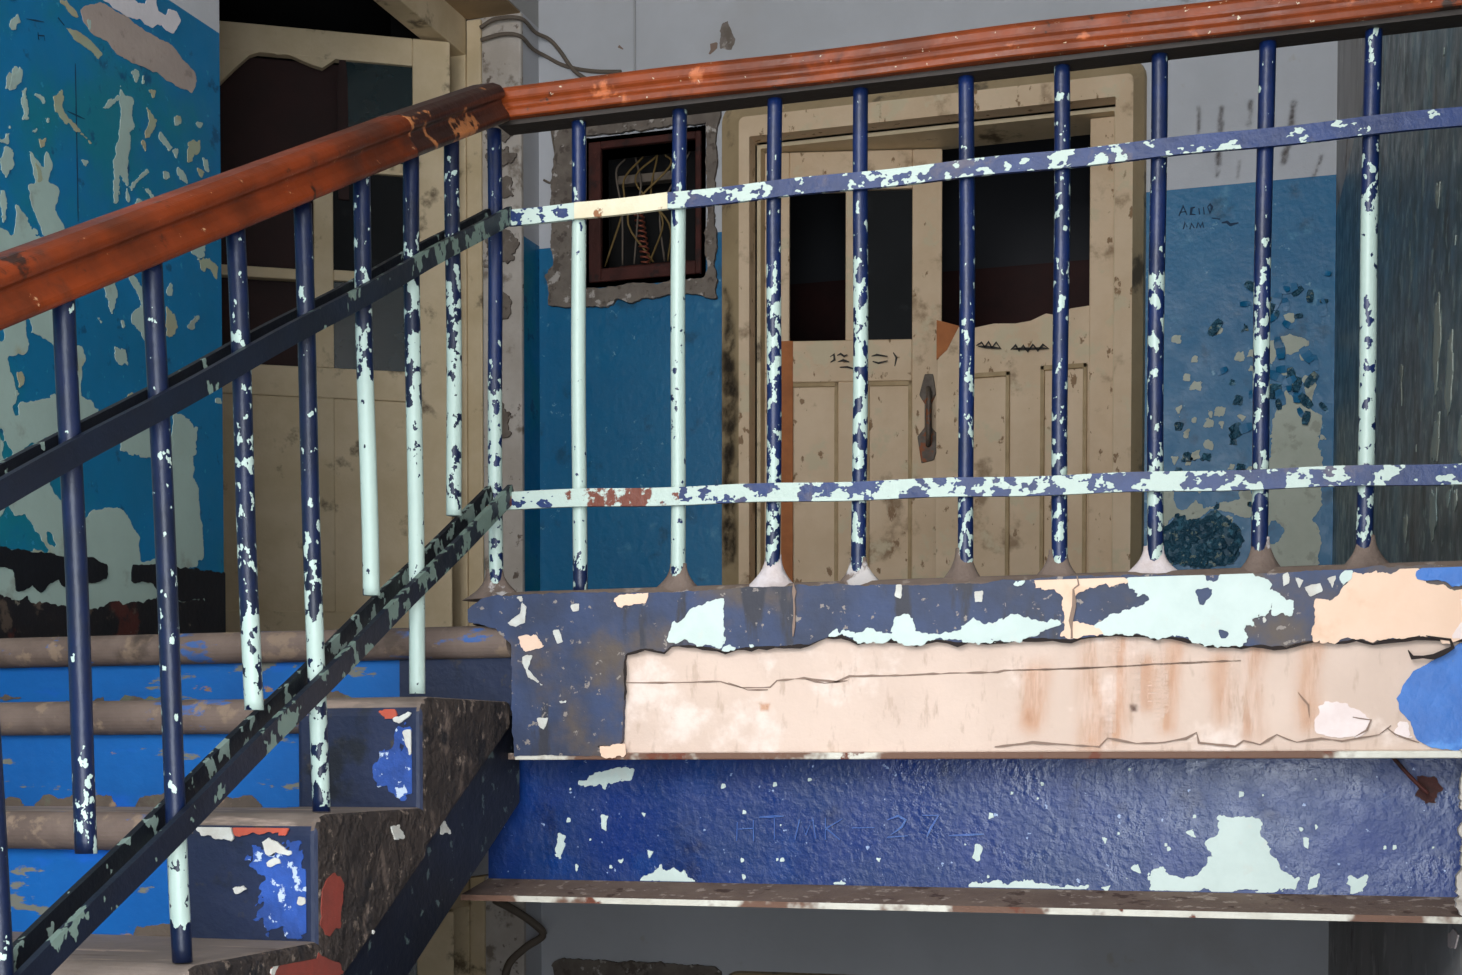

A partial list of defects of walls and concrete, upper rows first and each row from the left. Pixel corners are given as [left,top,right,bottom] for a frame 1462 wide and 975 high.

peeling [0,66,92,252]
flaking render [60,0,209,204]
flaking render [544,111,722,308]
peeling [0,309,58,461]
peeling [1171,313,1326,471]
peeling [86,507,157,609]
peeling [508,596,563,685]
peeling [829,485,1462,752]
crack [995,692,1419,748]
peeling [196,827,344,940]
peeling [964,844,1110,891]
peeling [1126,815,1320,893]